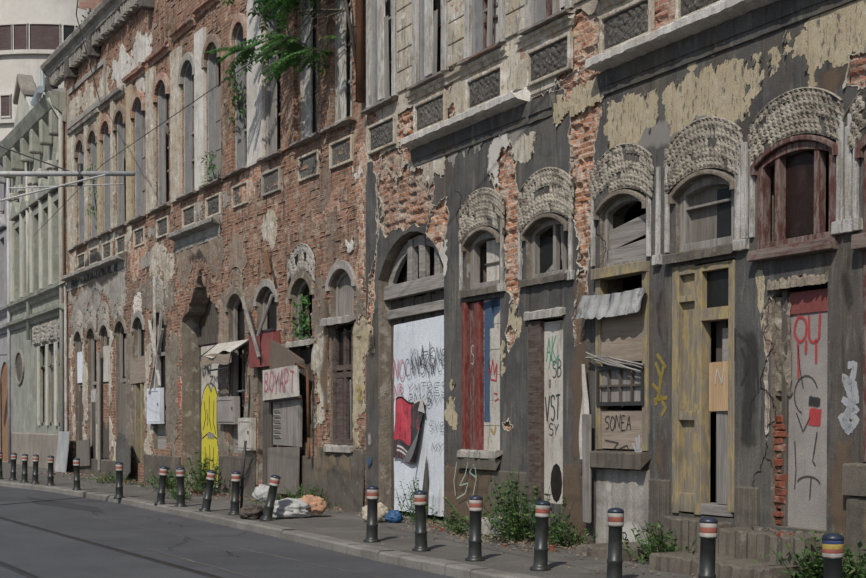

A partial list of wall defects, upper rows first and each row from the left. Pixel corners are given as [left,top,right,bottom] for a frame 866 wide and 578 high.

peeling [69,30,153,139]
flaking render [310,103,537,449]
flaking render [531,0,866,347]
flaking render [755,270,793,441]